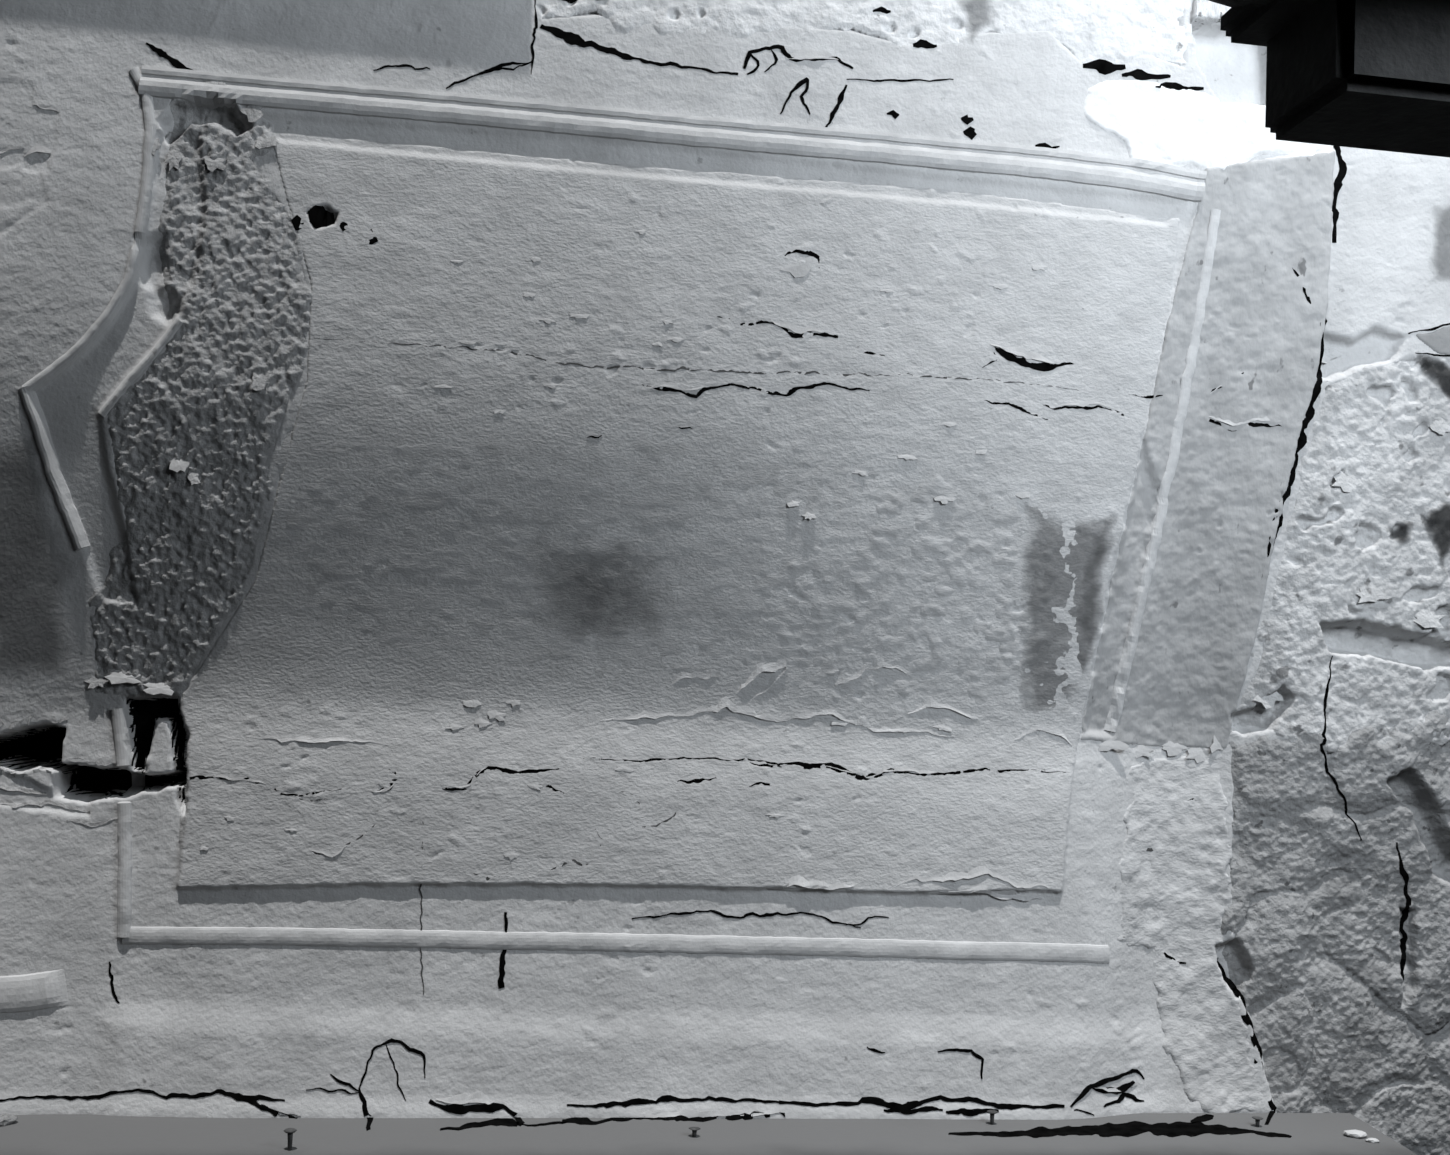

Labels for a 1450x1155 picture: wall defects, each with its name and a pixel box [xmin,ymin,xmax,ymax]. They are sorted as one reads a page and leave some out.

crack [373,0,954,127]
spalling [534,0,1196,66]
flaking render [1083,80,1333,170]
crack [1332,146,1347,243]
crack [1408,323,1450,357]
spalling [0,80,313,827]
crack [1208,268,1327,580]
spalling [1231,352,1450,753]
crack [632,910,889,928]
flaking render [1098,735,1266,1113]
crack [0,1038,1145,1131]
spalling [1344,1129,1379,1143]